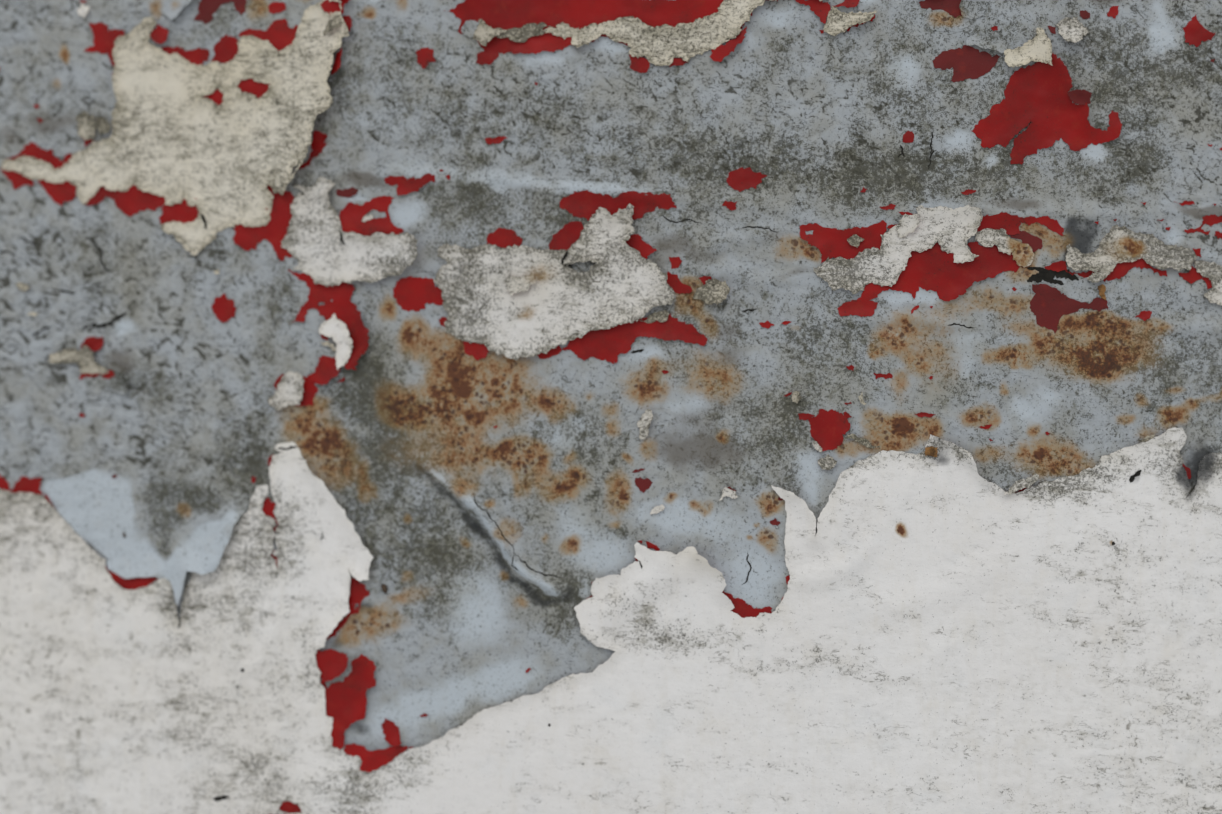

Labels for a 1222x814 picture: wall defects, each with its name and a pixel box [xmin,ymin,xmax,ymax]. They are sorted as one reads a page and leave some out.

rust [238,0,322,30]
peeling [450,0,891,80]
peeling [919,0,990,19]
peeling [873,16,1124,177]
peeling [1131,0,1194,70]
peeling [1,0,730,411]
peeling [799,186,1222,333]
rust [817,213,1222,487]
rust [269,272,756,616]
peeling [0,391,1222,814]